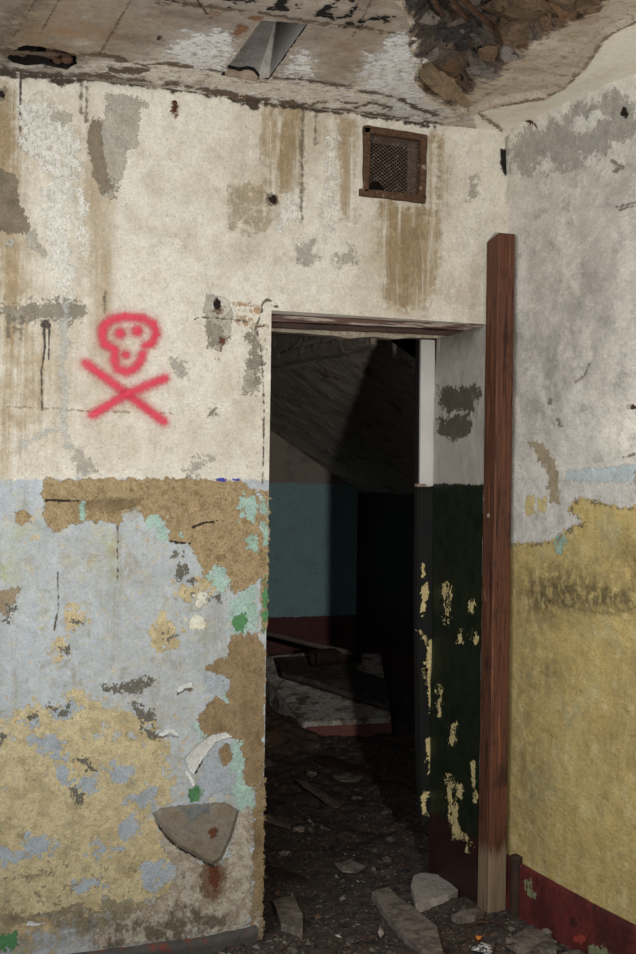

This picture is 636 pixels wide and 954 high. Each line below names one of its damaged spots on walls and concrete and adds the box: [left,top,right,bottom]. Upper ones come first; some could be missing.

crack [157,0,396,35]
crack [0,50,444,129]
crack [467,21,636,132]
leakage [226,107,356,243]
leakage [0,72,90,449]
leakage [381,200,438,307]
leakage [435,383,482,442]
peeling [511,472,636,555]
peeling [0,449,272,954]
peeling [418,630,443,717]
peeling [444,760,478,853]
rust [199,862,227,900]